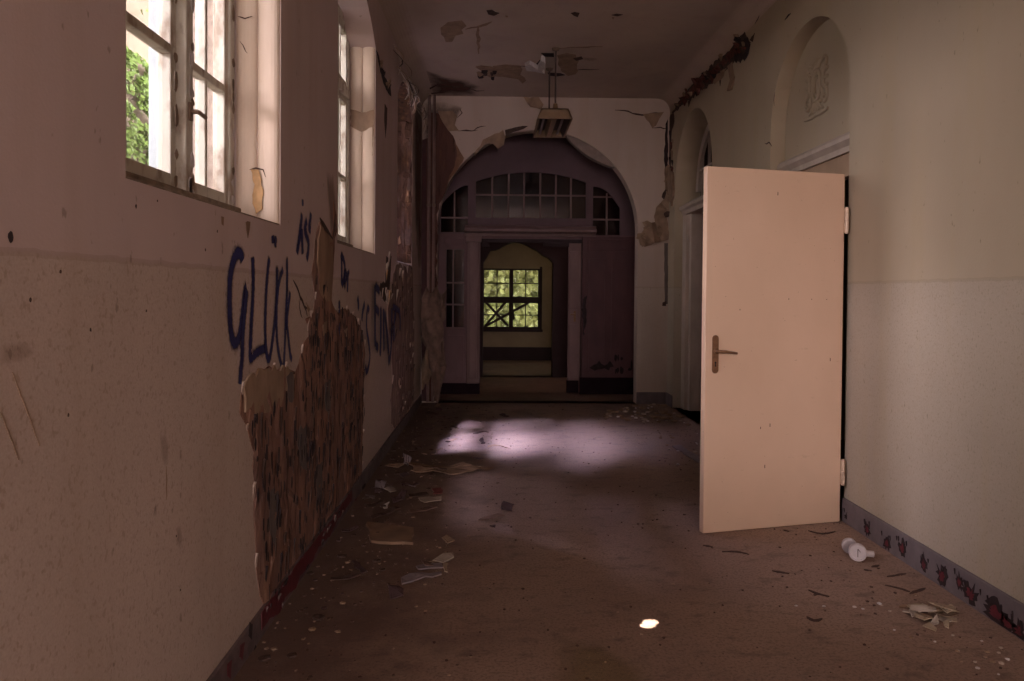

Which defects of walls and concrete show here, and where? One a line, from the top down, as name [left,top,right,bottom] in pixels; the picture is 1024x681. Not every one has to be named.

peeling [246,169,263,238]
peeling [376,45,527,304]
crack [617,110,666,129]
peeling [636,34,745,247]
peeling [239,201,366,660]